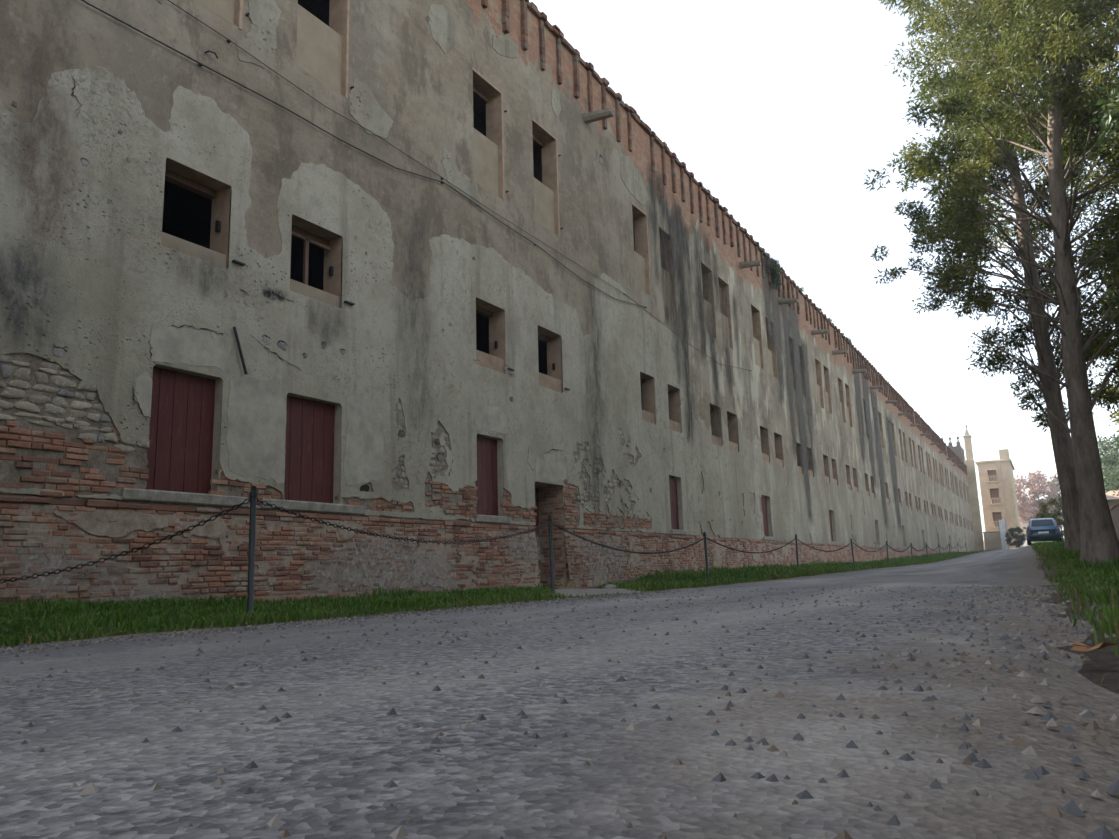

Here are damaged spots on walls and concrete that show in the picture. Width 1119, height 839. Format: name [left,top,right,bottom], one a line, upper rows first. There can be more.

peeling [0,66,976,552]